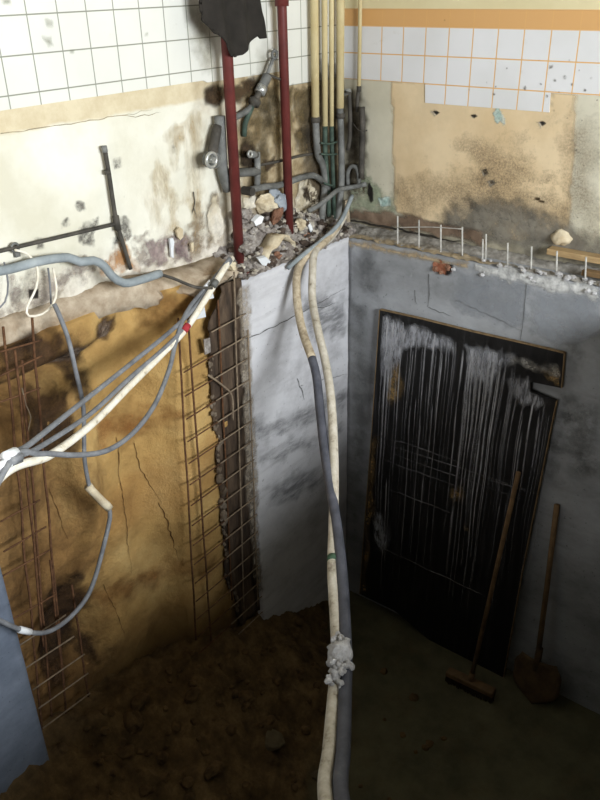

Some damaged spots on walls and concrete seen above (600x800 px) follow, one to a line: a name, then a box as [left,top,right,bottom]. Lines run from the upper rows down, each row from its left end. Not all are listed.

peeling [207,196,225,242]
crack [246,290,341,339]
peeling [294,179,318,214]
peeling [349,82,575,246]
crack [414,274,527,339]
water stain [443,198,600,255]
spalling [475,259,600,301]
spalling [0,318,91,730]
crack [116,437,178,557]
spalling [177,272,263,654]
water stain [381,338,543,502]
water stain [38,574,96,687]